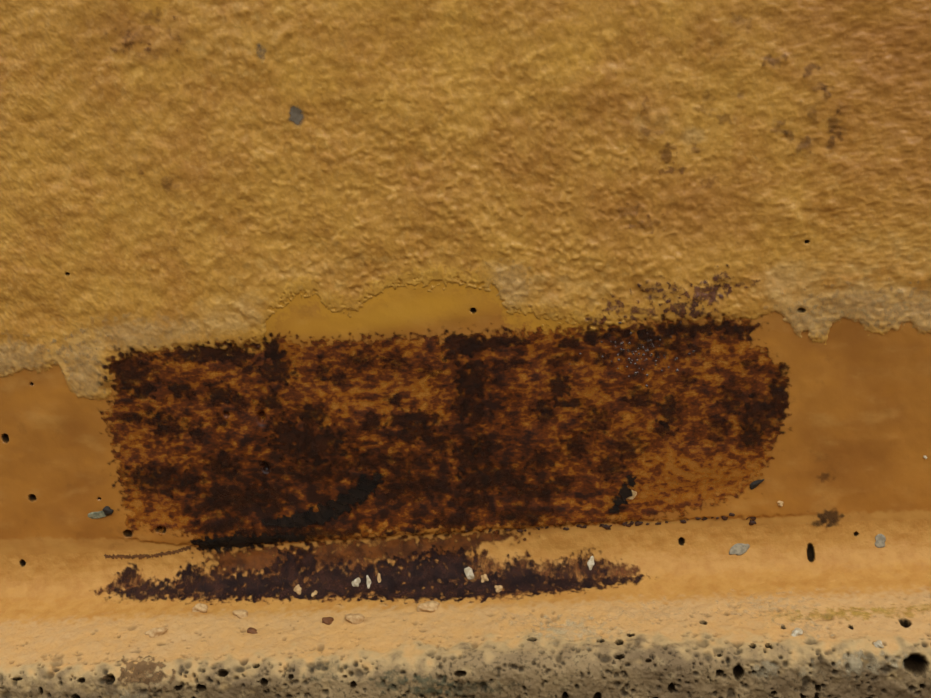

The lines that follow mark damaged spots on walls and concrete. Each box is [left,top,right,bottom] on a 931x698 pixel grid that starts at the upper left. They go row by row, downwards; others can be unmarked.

peeling [88,497,114,519]
rust [95,264,790,603]